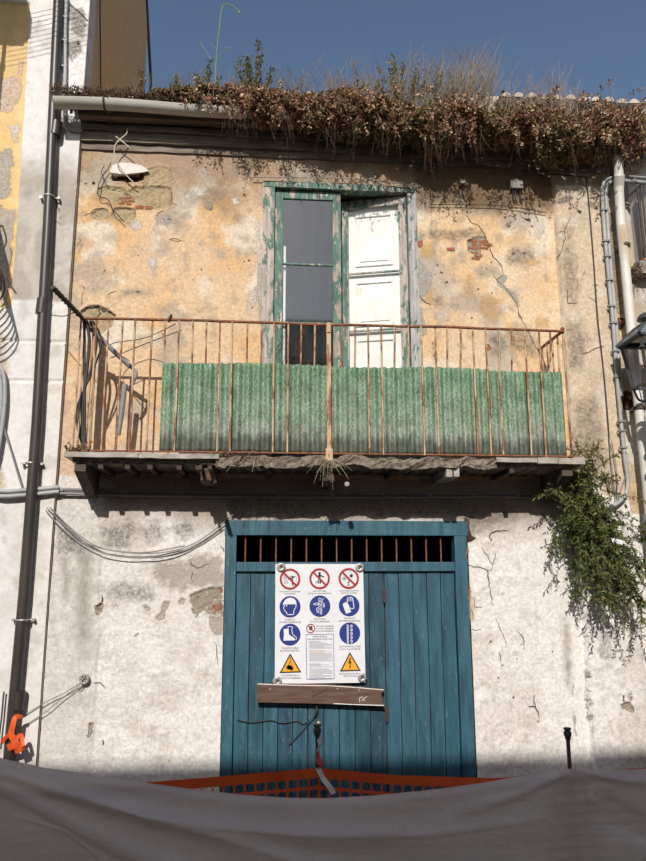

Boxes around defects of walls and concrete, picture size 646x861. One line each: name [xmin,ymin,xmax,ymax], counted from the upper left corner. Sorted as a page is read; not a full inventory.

peeling [0,61,23,112]
peeling [0,124,20,308]
spalling [82,305,116,334]
spalling [85,163,214,223]
spalling [418,229,492,269]
crack [466,215,538,350]
peeling [155,554,224,635]
crack [469,530,525,661]